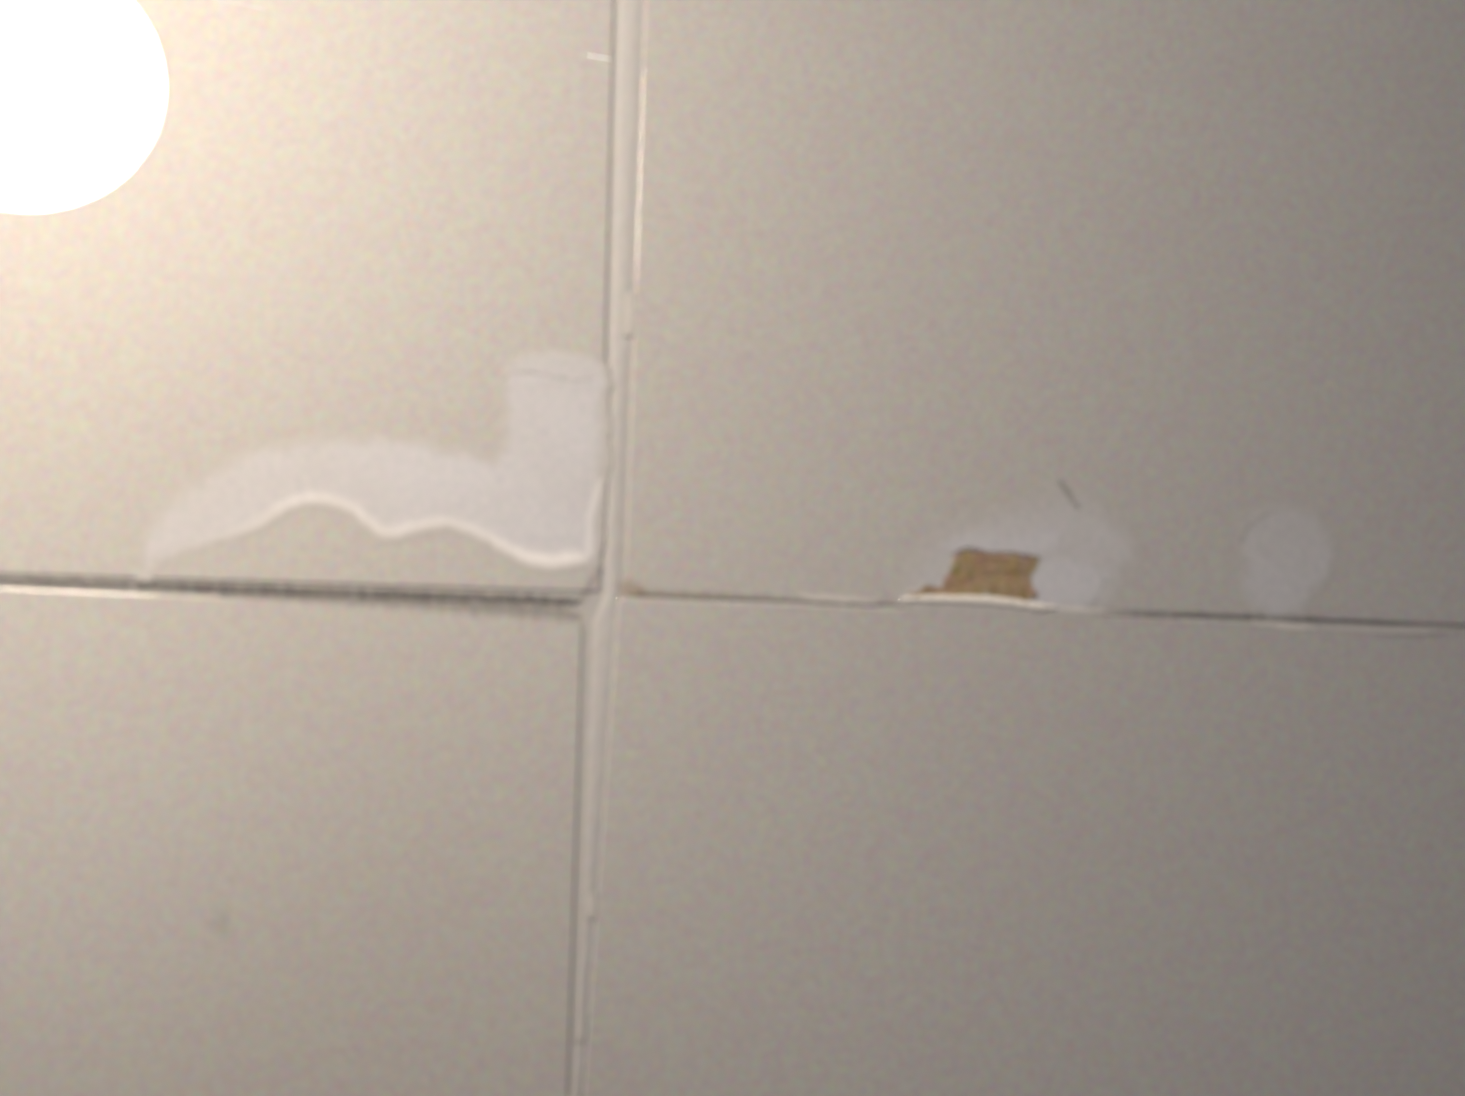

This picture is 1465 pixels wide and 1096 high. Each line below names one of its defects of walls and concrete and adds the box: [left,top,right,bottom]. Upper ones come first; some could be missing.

spalling [136,347,613,584]
spalling [890,482,1173,623]